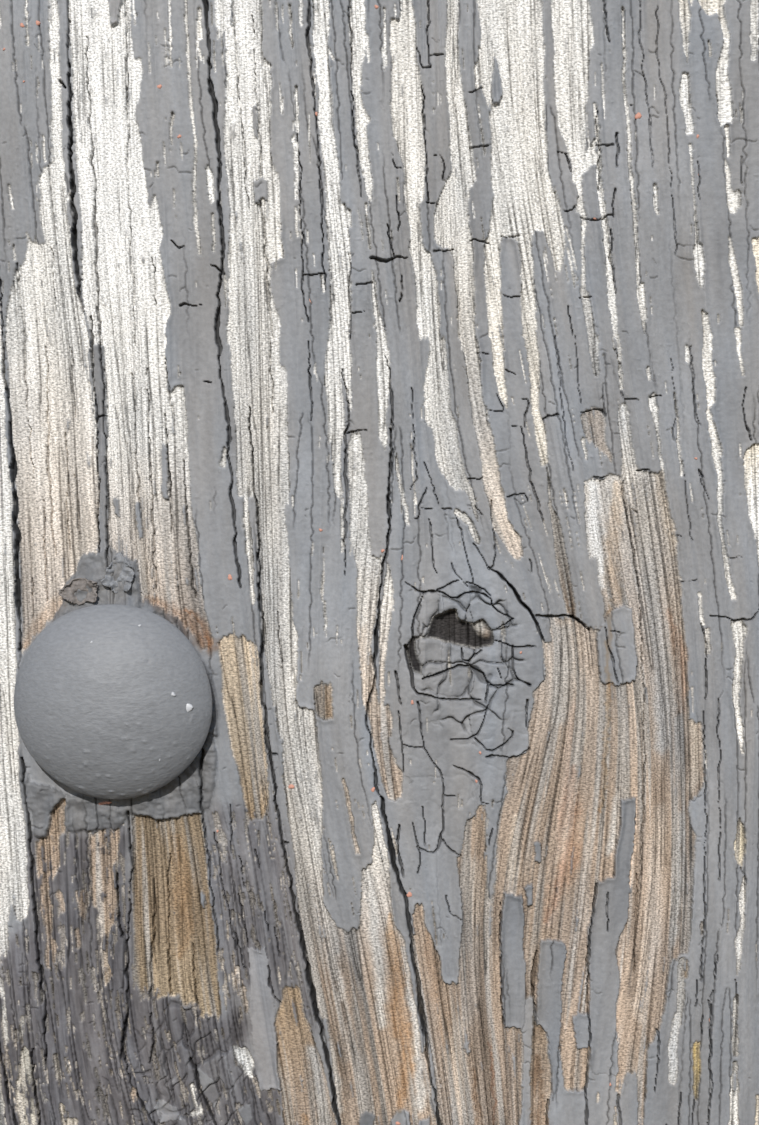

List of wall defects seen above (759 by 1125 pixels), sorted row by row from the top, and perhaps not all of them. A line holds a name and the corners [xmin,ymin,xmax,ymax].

crack [299,0,407,422]
crack [392,0,446,204]
crack [603,0,702,255]
peeling [0,0,222,1051]
crack [0,0,341,1125]
peeling [215,0,705,1125]
crack [342,108,710,1125]
peeling [697,593,712,656]
peeling [0,1016,48,1125]
peeling [59,1103,79,1125]
peeling [155,1065,221,1123]
crack [654,609,759,1125]